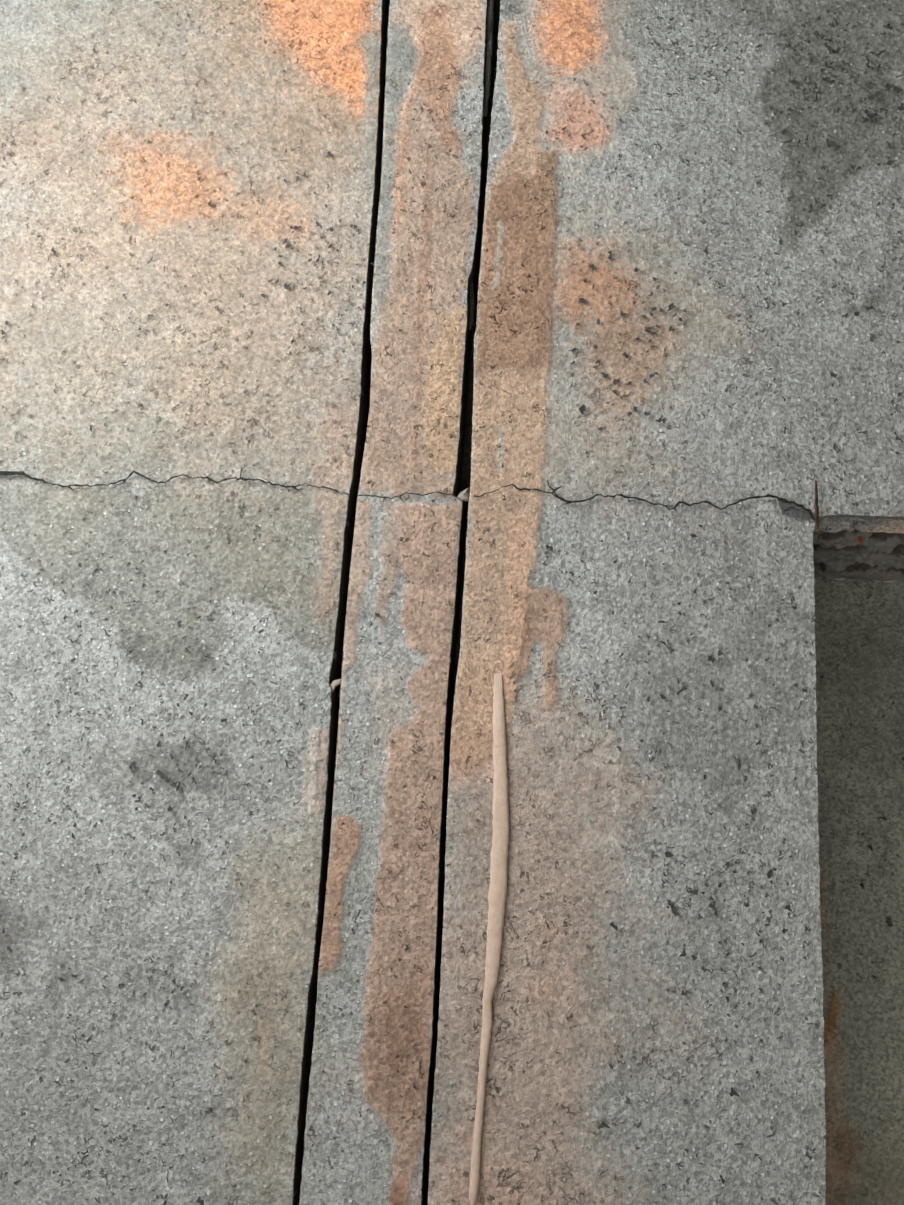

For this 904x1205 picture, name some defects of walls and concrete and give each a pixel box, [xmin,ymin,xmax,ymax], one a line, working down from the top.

rust [267,0,370,103]
leakage [760,0,904,252]
rust [565,260,620,319]
crack [0,465,778,512]
rust [345,0,598,1205]
rust [318,817,359,972]
rust [824,1000,837,1056]